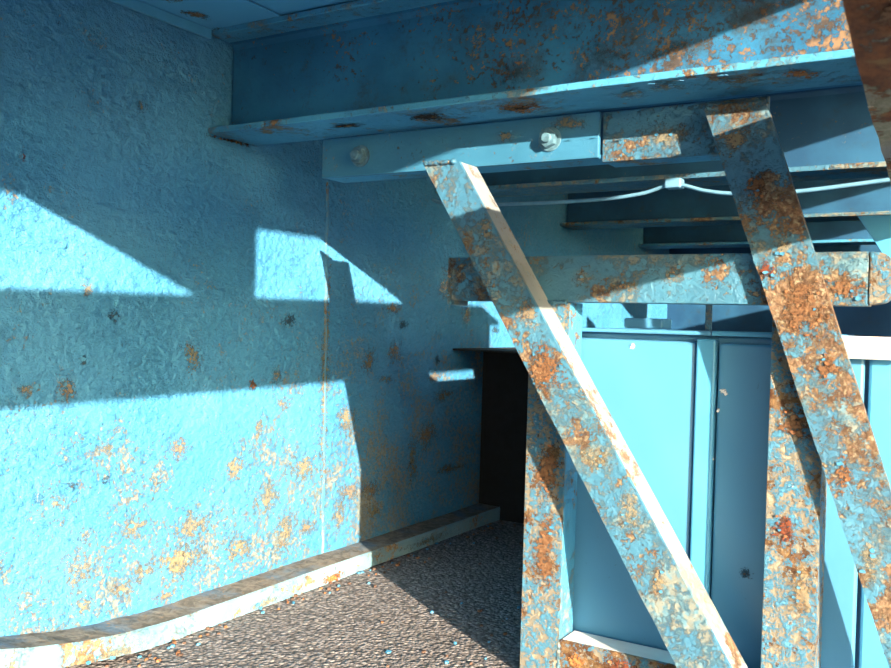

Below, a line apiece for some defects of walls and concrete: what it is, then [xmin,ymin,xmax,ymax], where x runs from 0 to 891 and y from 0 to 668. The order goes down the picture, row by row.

rust [759,236,868,344]
rust [285,243,359,511]
rust [515,298,568,399]
rust [808,349,848,385]
rust [775,403,811,444]
rust [830,450,854,496]
rust [60,529,95,613]
rust [112,510,212,601]
rust [253,484,315,550]
rust [527,437,560,596]
rust [771,514,796,547]
rust [786,562,816,628]